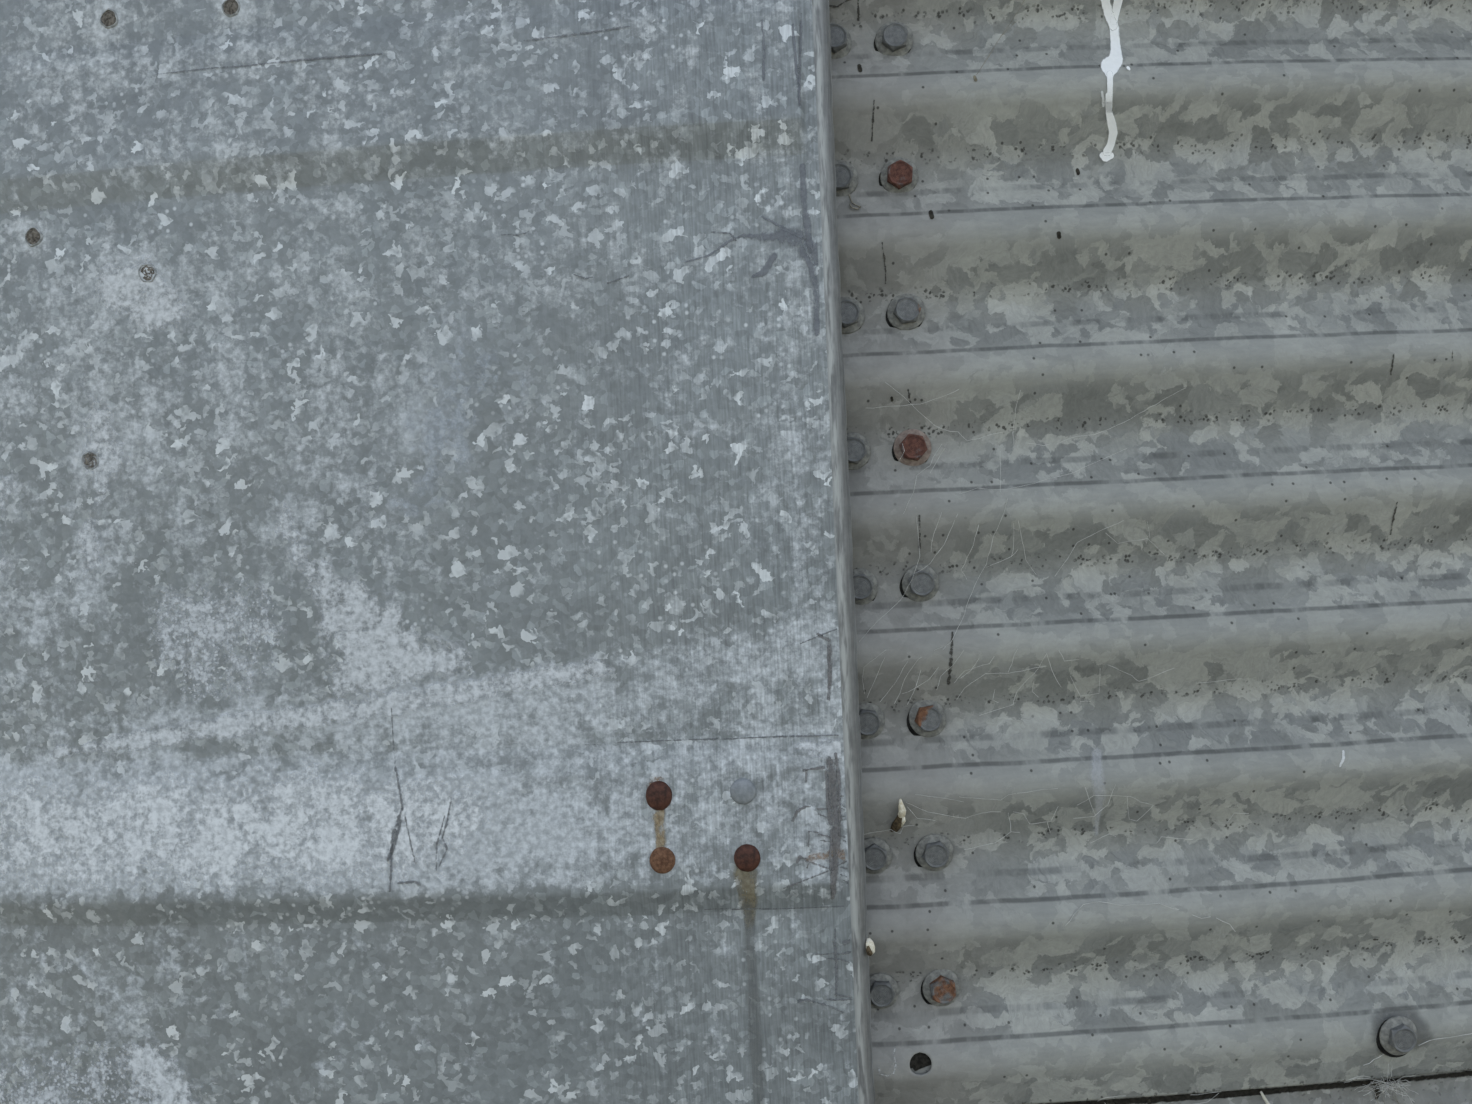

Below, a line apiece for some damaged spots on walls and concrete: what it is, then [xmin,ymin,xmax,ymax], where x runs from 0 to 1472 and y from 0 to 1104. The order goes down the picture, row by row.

corrosion [654,810,665,848]
corrosion [734,866,757,928]